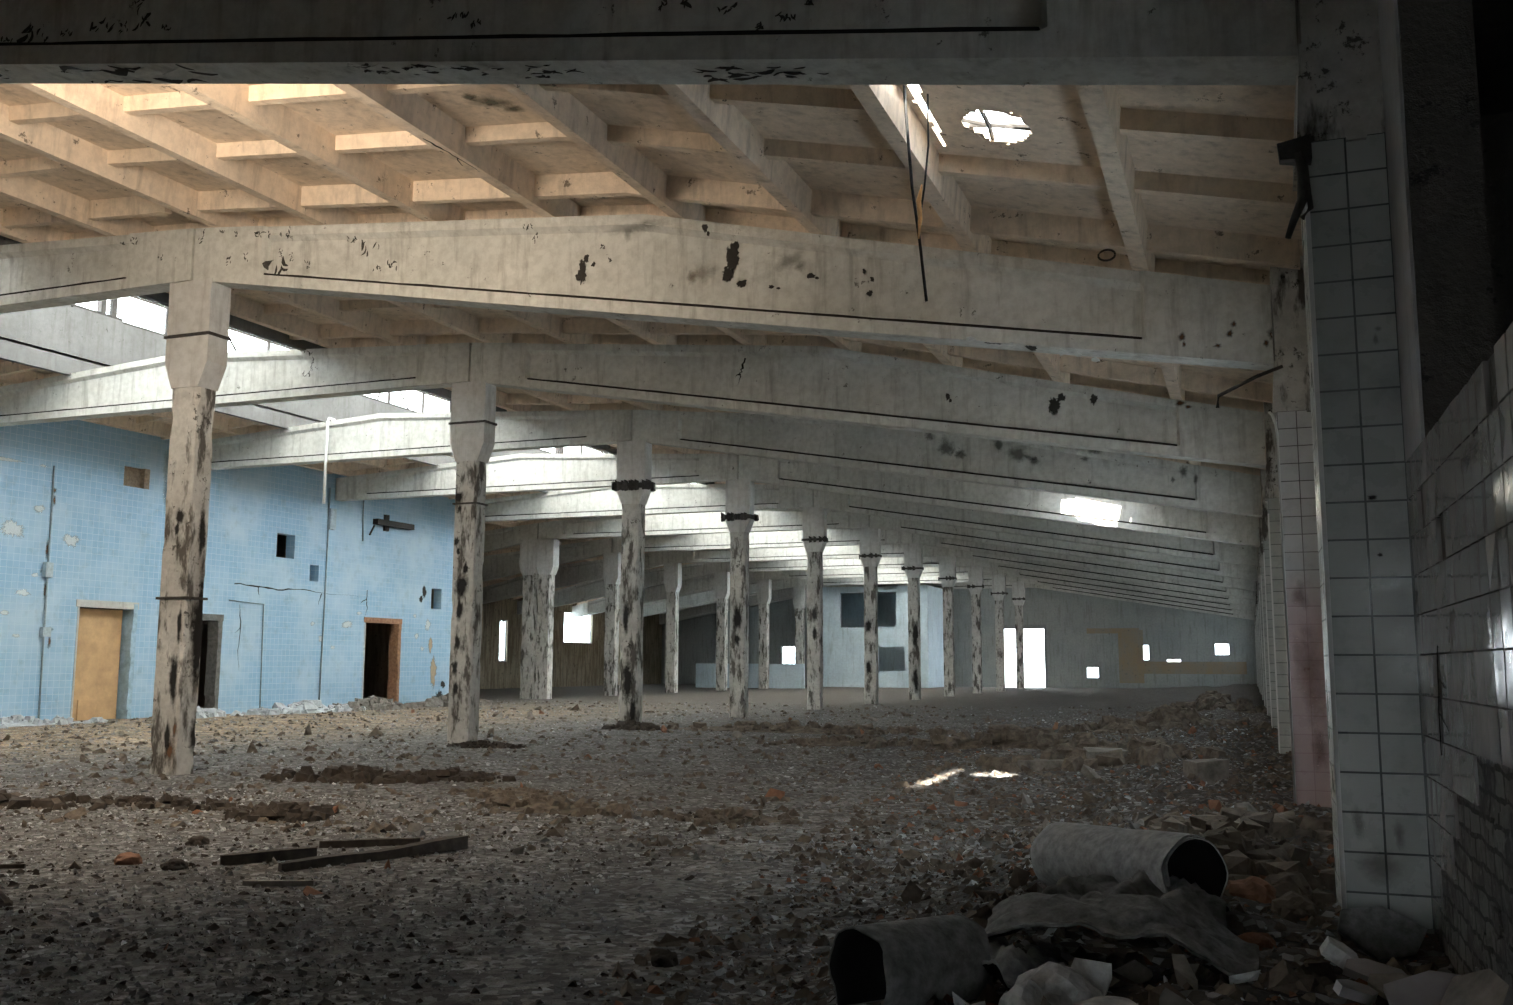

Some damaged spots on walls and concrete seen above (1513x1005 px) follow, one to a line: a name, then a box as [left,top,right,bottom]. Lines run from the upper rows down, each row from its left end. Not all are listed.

spalling [954,105,1038,145]